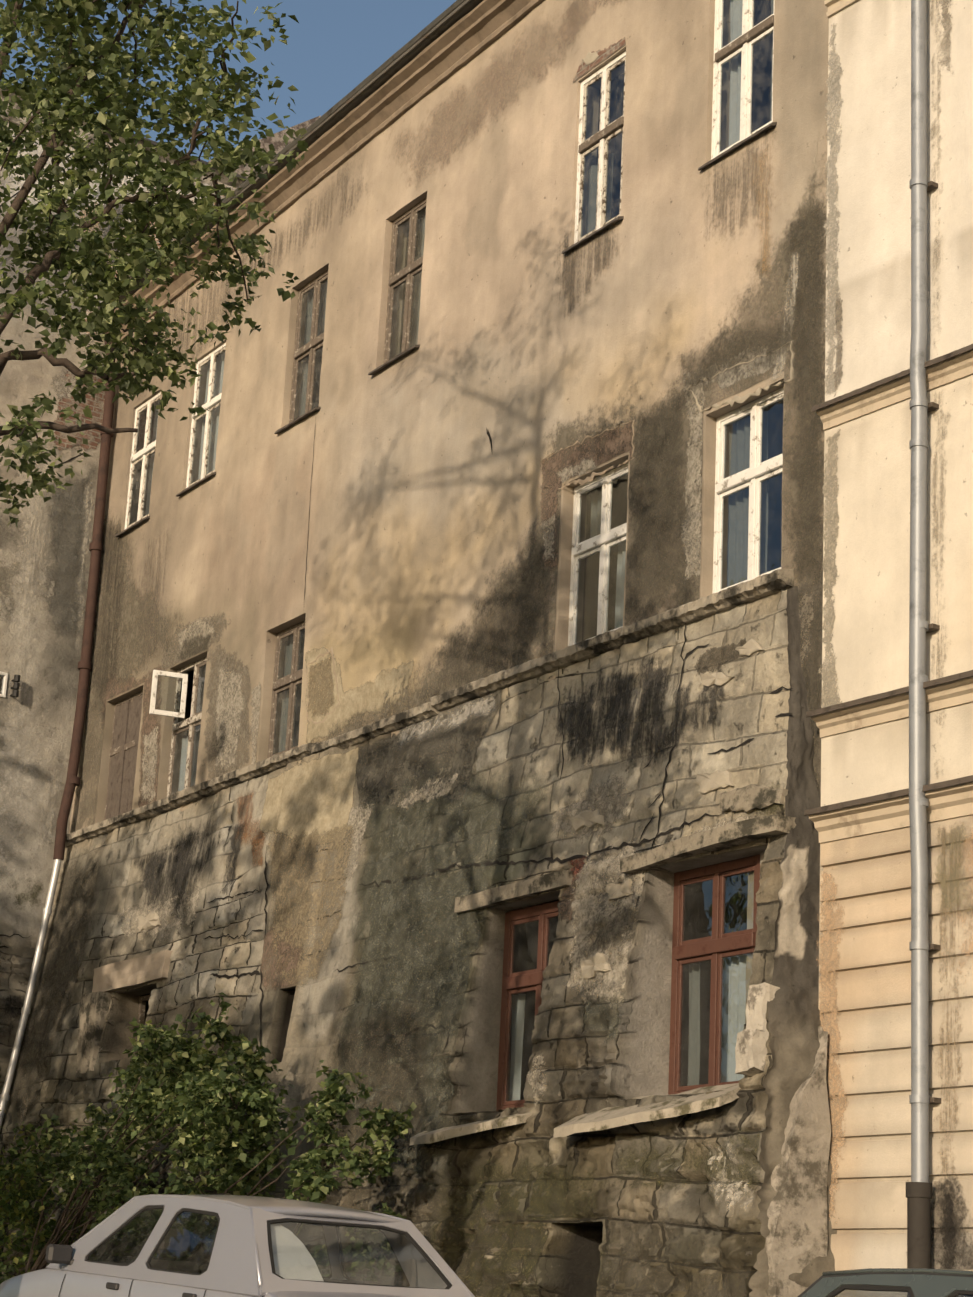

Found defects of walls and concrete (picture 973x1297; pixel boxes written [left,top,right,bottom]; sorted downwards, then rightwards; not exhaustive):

flaking render [121,183,235,253]
leakage [320,175,827,800]
leakage [0,456,180,833]
peeling [398,773,458,808]
crack [307,623,723,921]
spalling [694,638,765,687]
crack [708,686,793,754]
leakage [139,823,245,909]
crack [205,845,269,1084]
crack [308,951,396,972]
spalling [551,773,646,1039]
leakage [931,1149,973,1269]